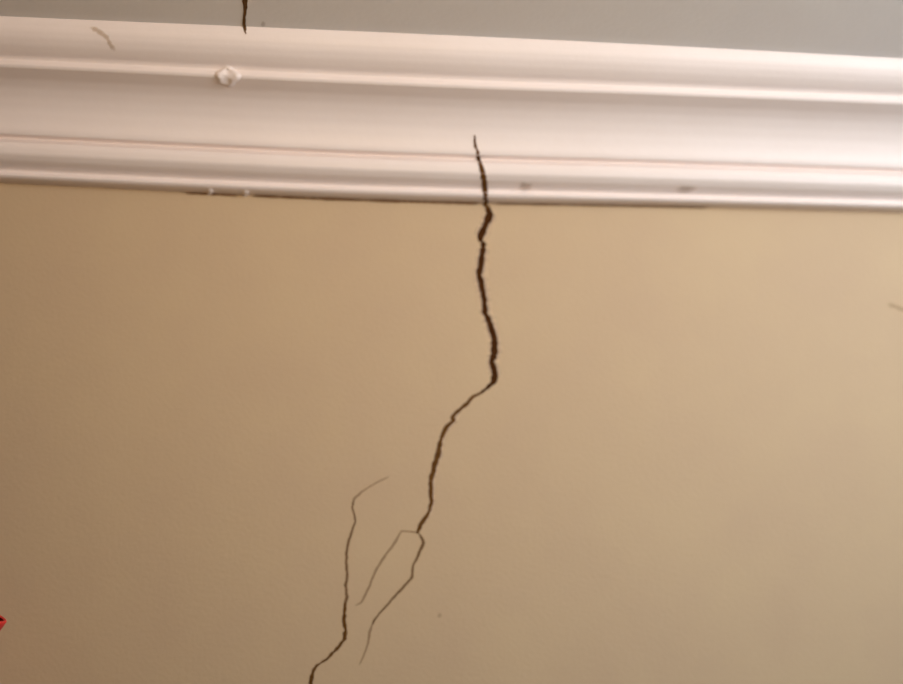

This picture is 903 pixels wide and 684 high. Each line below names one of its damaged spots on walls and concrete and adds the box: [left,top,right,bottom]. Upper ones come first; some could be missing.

crack [241,0,249,34]
crack [373,135,499,623]
crack [309,502,356,684]